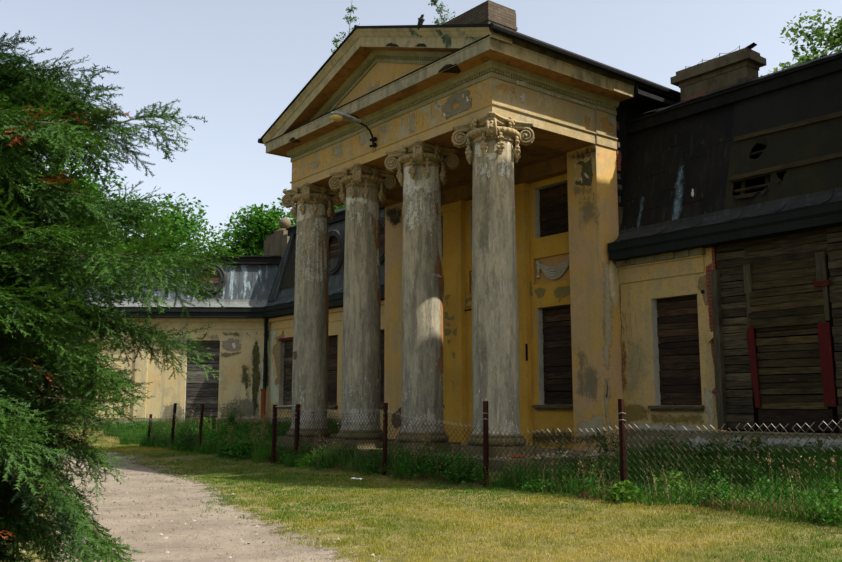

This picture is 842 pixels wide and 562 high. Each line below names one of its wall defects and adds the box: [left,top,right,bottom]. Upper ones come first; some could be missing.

spalling [436,90,472,120]
peeling [473,143,513,180]
spalling [574,158,593,186]
damp [672,169,694,220]
peeling [294,203,329,350]
peeling [346,197,381,306]
peeling [403,165,457,381]
peeling [221,332,241,357]
damp [219,341,269,418]
peeling [391,375,444,429]